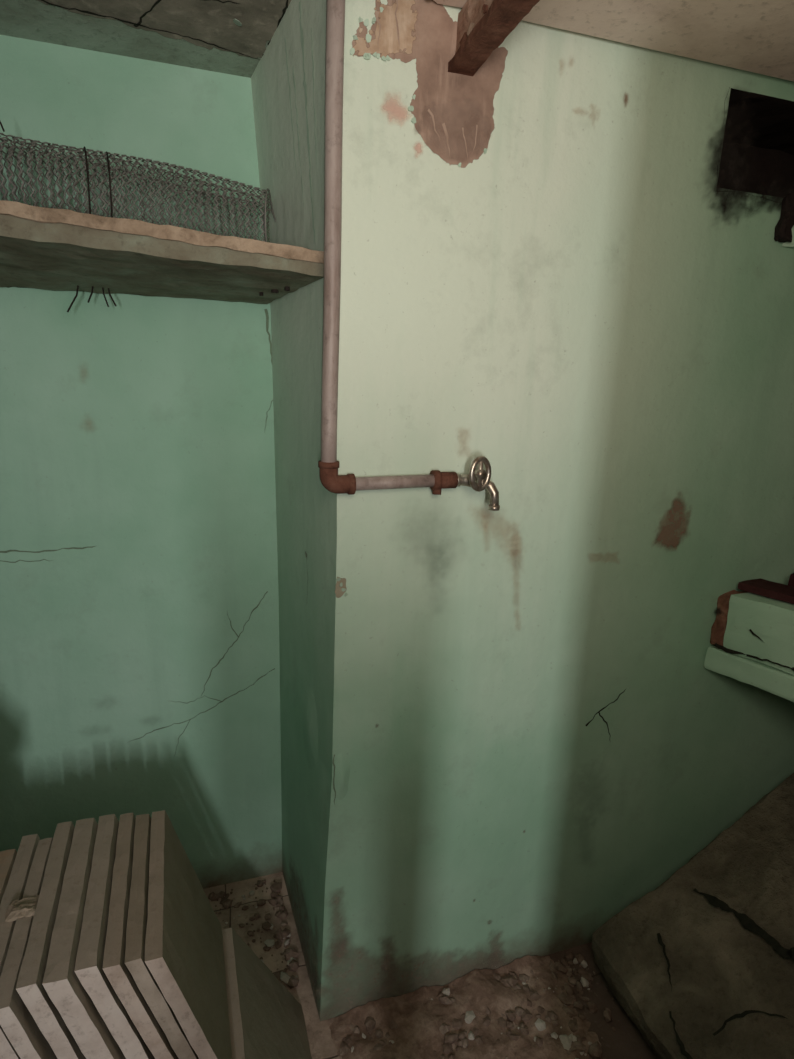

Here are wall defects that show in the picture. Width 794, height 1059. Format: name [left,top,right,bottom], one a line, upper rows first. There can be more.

peeling [350,0,508,168]
crack [0,546,95,563]
peeling [656,499,686,548]
crack [127,591,275,756]
crack [693,888,794,961]
crack [657,933,693,1059]
crack [713,1010,788,1036]